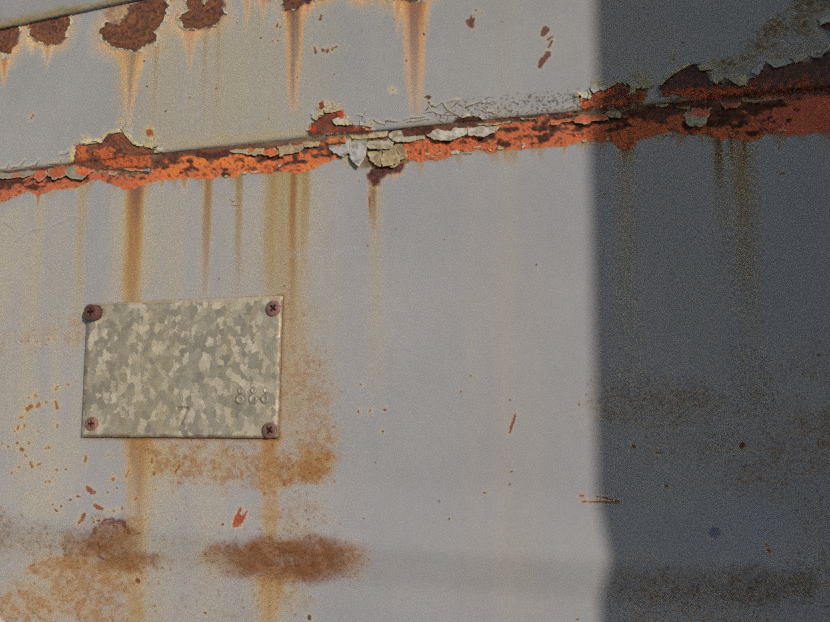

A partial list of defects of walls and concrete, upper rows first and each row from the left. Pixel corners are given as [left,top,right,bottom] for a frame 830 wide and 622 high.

corrosion [0,15,74,71]
corrosion [98,0,227,86]
corrosion [387,0,427,57]
peeling [443,90,597,124]
corrosion [359,14,830,206]
peeling [328,129,425,168]
corrosion [0,101,375,308]
corrosion [126,425,334,498]
corrosion [0,518,158,622]
corrosion [204,535,359,606]